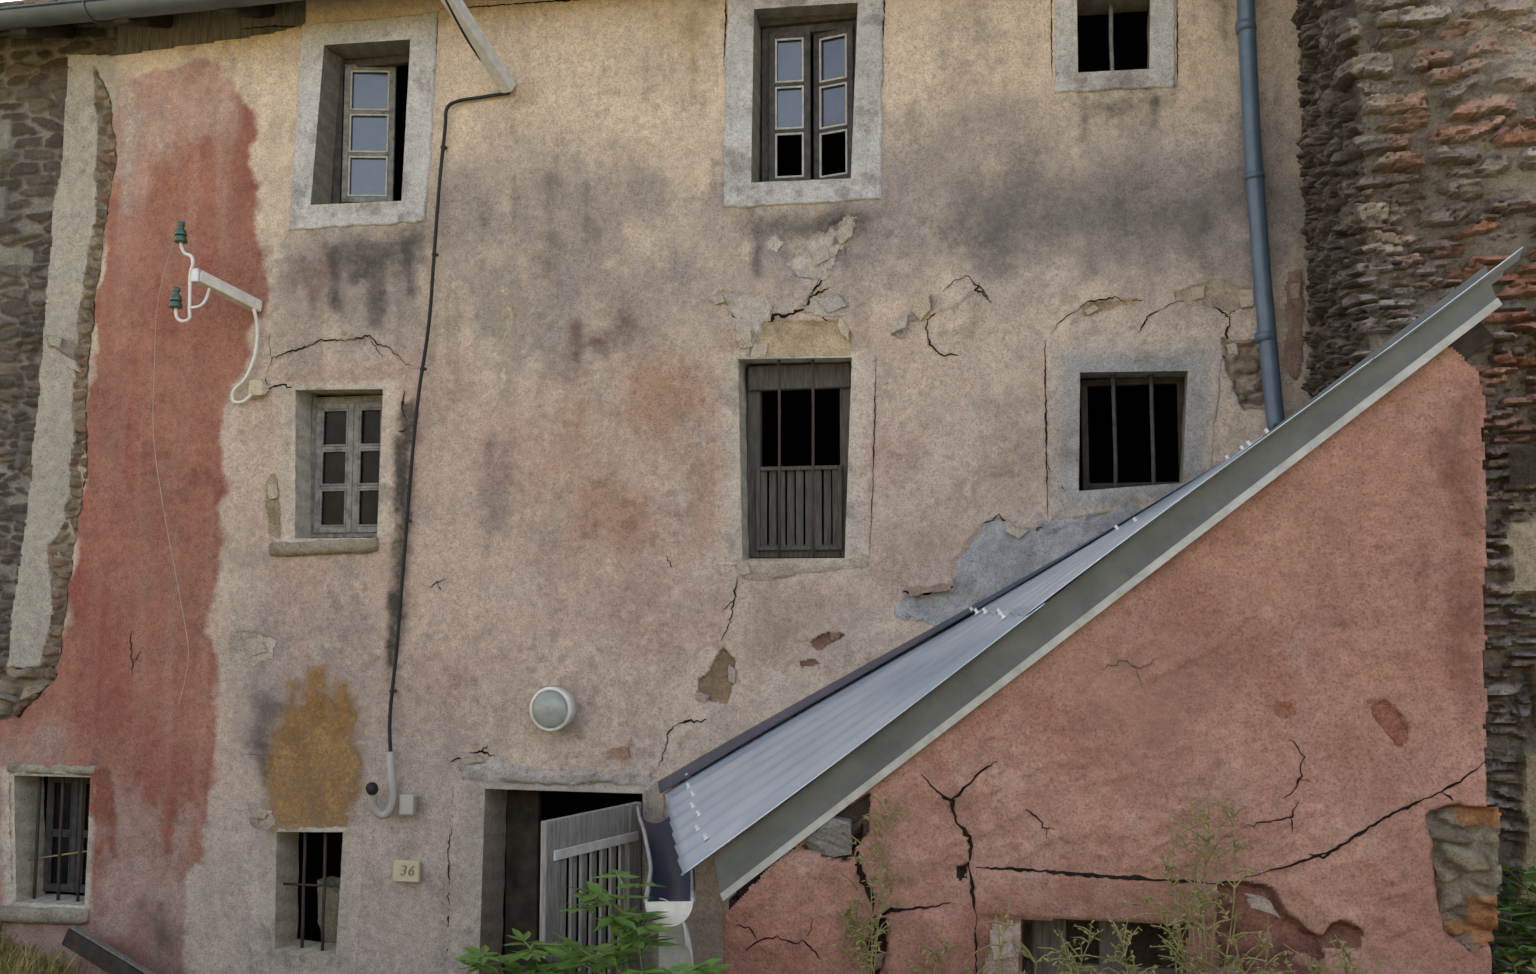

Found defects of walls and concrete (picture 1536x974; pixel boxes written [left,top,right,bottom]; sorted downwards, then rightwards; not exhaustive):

damp [315,230,420,321]
flaking render [710,215,857,358]
crack [925,275,992,357]
crack [265,333,411,433]
crack [984,296,1235,531]
peeling [894,502,1141,628]
crack [721,583,737,641]
flaking render [695,647,737,704]
crack [659,719,707,766]
flaking render [1372,701,1409,747]
crack [853,739,1487,973]
flaking render [1214,881,1364,974]